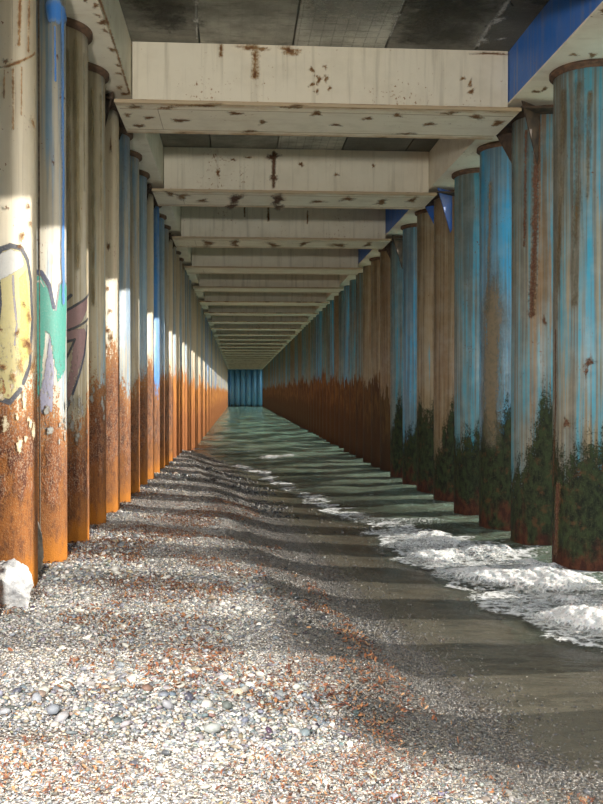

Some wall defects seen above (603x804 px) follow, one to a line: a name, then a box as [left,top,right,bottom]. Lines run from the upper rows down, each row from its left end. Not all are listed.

rust [0,0,35,130]
rust [83,0,130,95]
rust [237,44,267,79]
leakage [390,0,510,46]
rust [523,125,547,324]
rust [572,84,592,247]
rust [0,309,173,588]
rust [553,329,570,555]